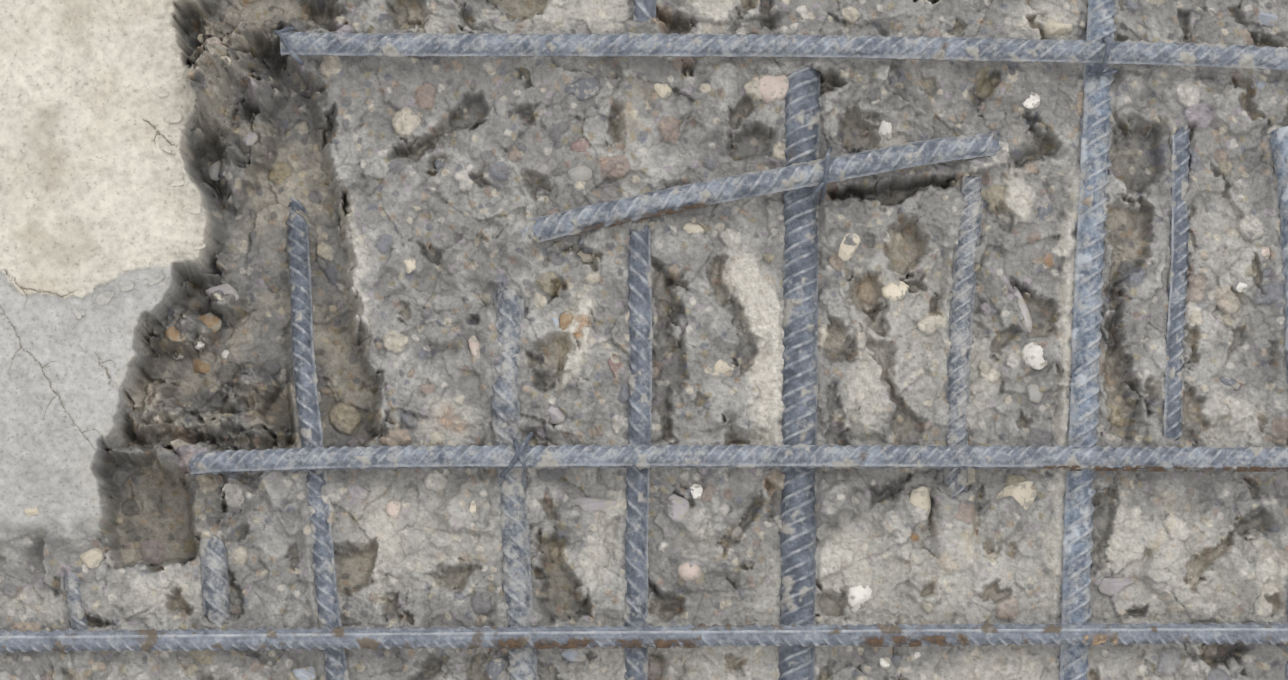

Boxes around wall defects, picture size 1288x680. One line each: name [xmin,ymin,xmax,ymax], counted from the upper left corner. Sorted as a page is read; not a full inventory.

spalling [0,444,1288,680]
spalling [297,55,1288,627]